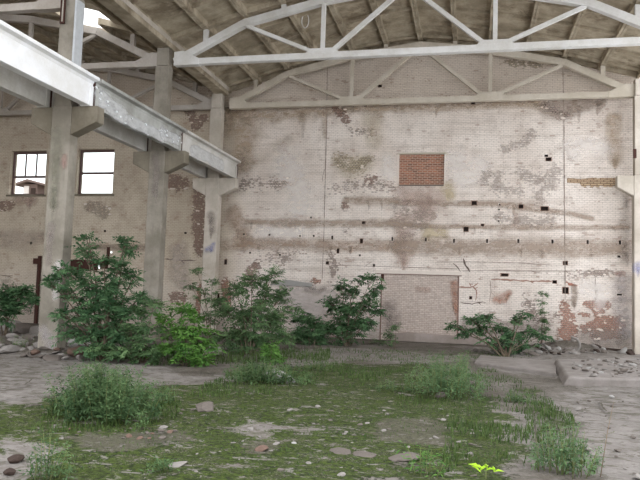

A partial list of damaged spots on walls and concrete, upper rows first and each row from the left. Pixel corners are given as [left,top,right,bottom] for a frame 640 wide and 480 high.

flaking render [168,174,205,257]
water stain [224,189,630,254]
flaking render [565,176,615,188]
flaking render [521,268,627,341]